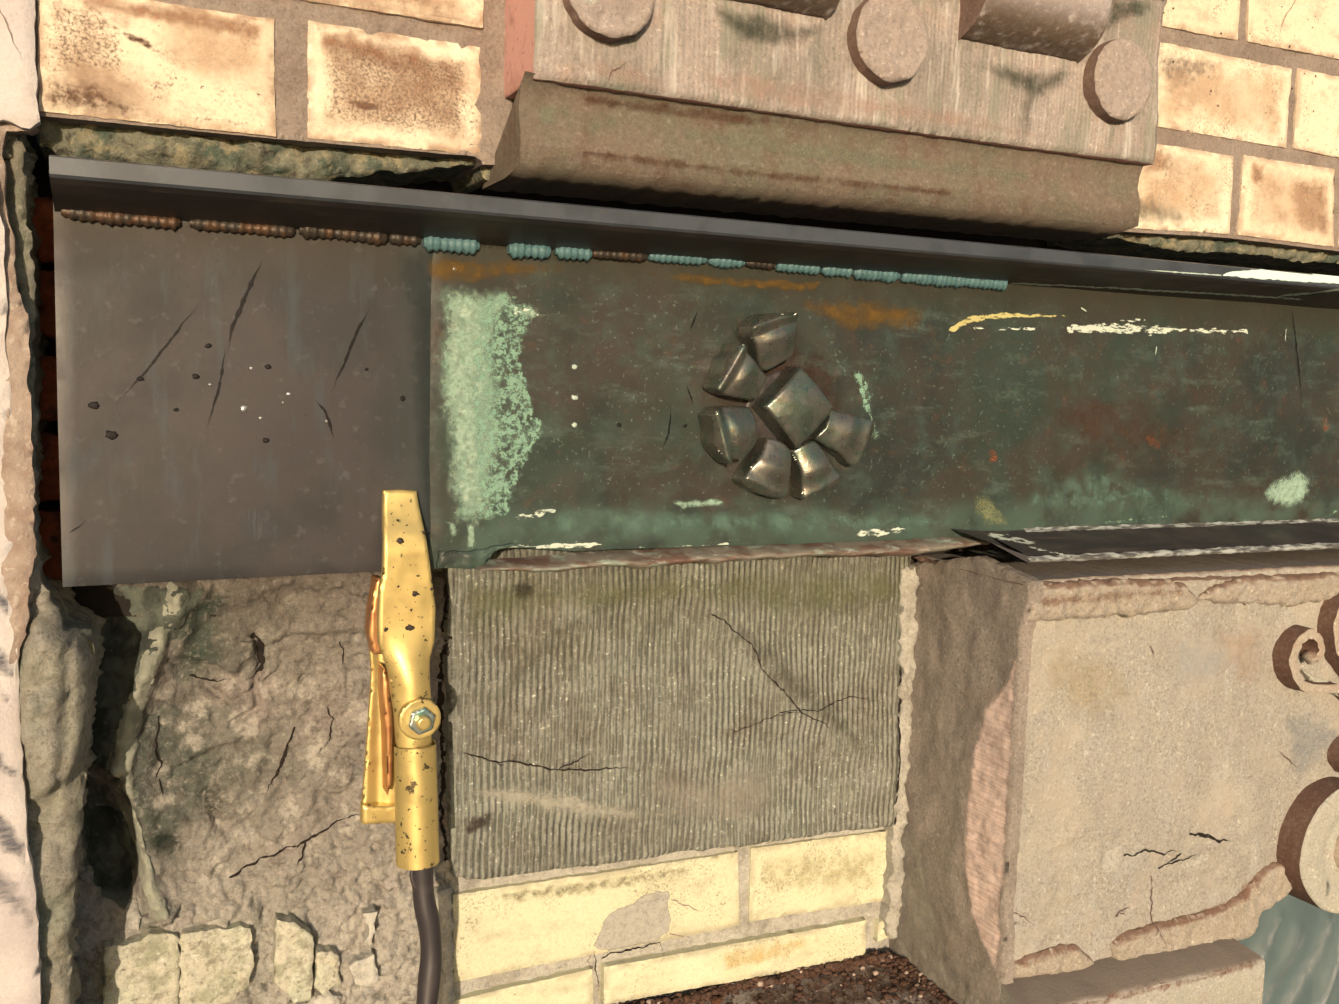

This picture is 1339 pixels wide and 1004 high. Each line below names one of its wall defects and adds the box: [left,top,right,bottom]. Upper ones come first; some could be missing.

leakage [433,262,538,547]
leakage [518,506,569,527]
peeling [222,640,257,679]
crack [711,614,886,746]
crack [464,753,651,773]
spalling [102,899,255,1004]
crack [229,814,356,878]
spalling [272,903,379,1004]
spalling [594,891,671,951]
crack [1116,833,1233,950]